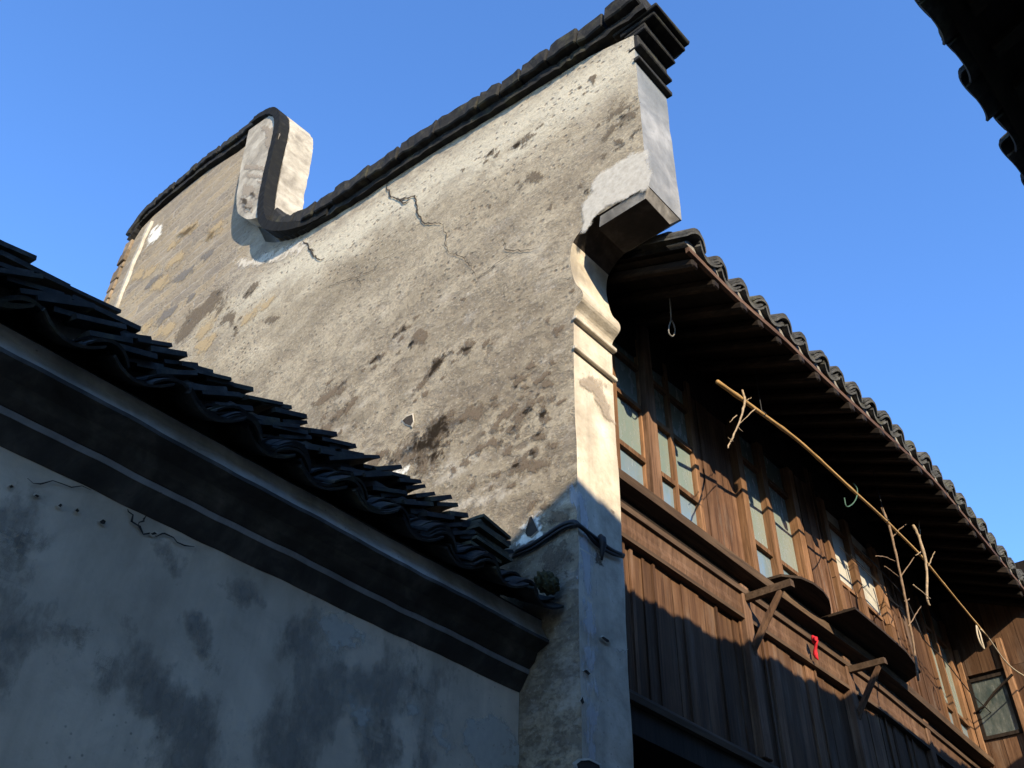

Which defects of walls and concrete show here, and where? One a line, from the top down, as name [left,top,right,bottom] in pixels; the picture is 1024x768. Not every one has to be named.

crack [303,242,324,260]
crack [386,183,534,278]
damp [311,379,358,435]
damp [367,357,566,491]
crack [27,478,91,490]
crack [127,509,195,547]
peeling [516,515,543,546]
damp [262,620,429,768]